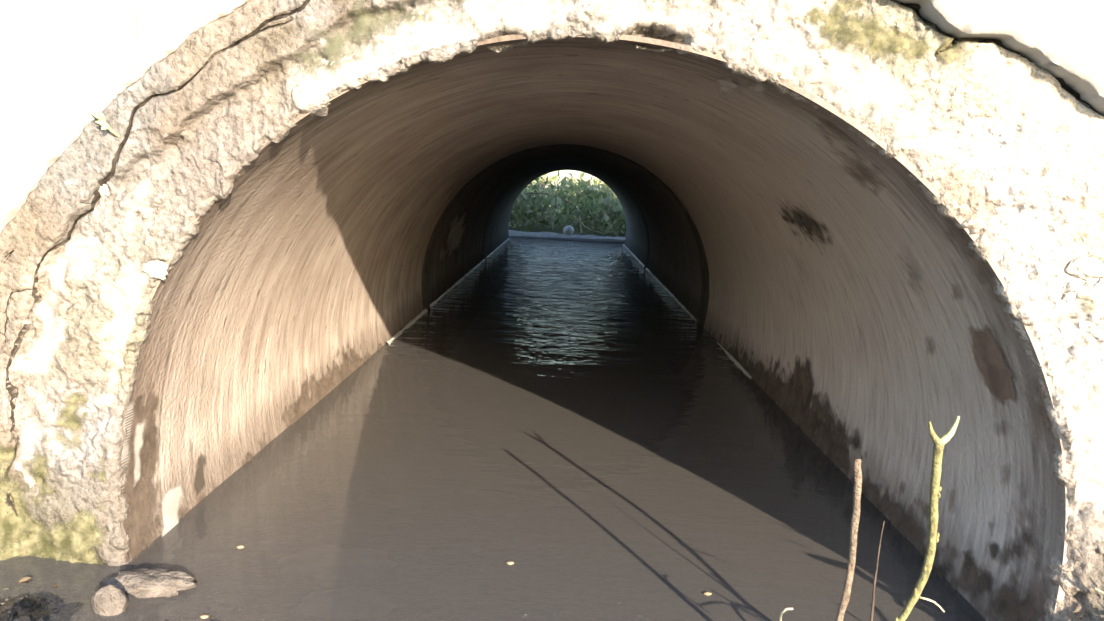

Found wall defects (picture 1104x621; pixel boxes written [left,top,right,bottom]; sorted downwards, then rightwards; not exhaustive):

crack [891,0,1104,116]
leakage [12,236,92,373]
crack [4,0,309,544]
rust [970,326,1015,403]
leakage [14,426,52,487]